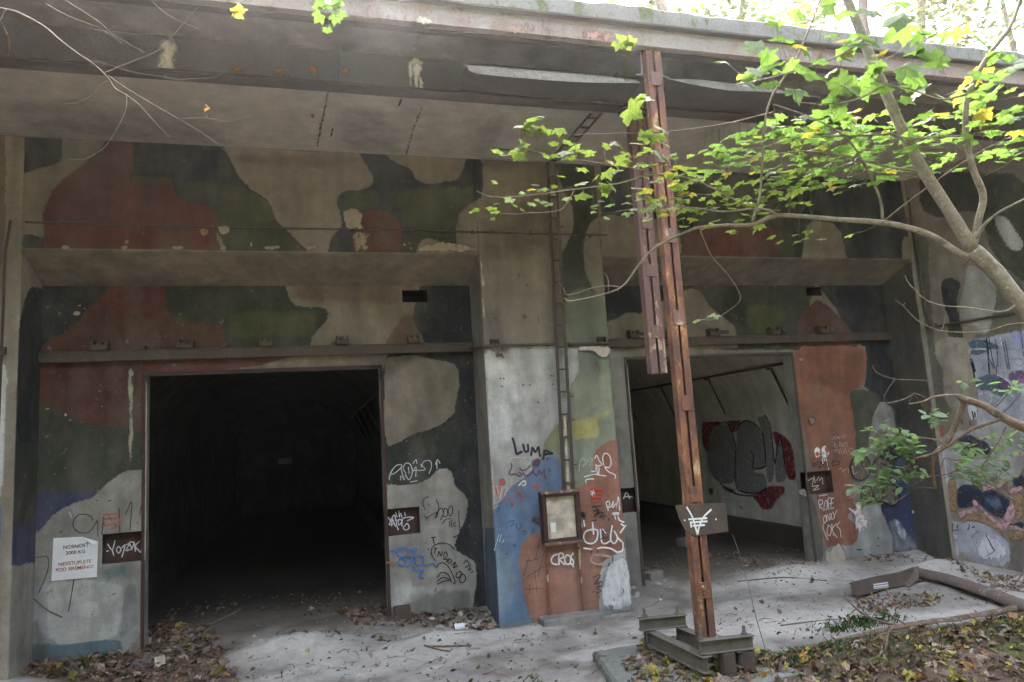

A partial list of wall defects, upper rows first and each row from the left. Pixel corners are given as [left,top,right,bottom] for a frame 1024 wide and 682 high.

crack [311,92,334,146]
peeling [343,208,370,253]